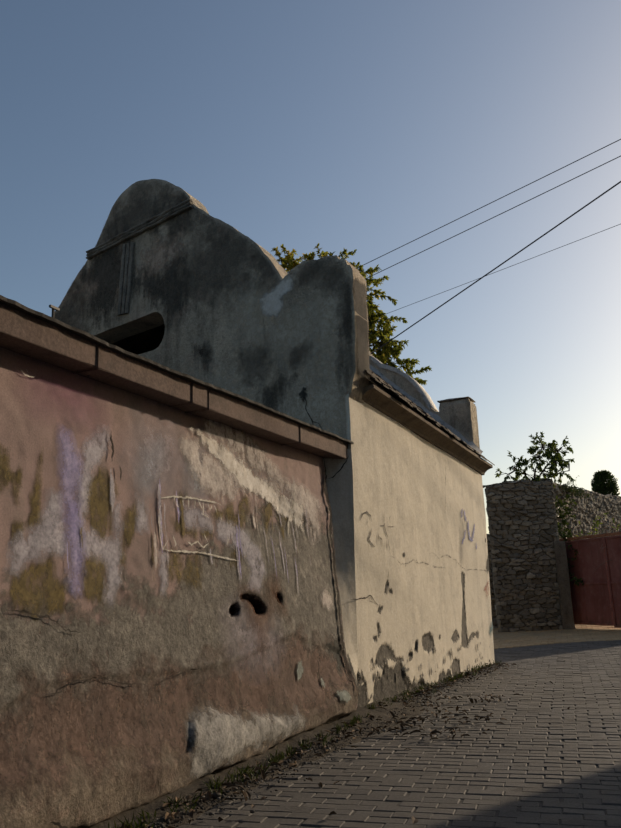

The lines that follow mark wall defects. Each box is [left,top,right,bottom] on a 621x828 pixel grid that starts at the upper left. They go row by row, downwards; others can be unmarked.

leakage [55,188,274,325]
leakage [300,261,370,378]
peeling [0,448,22,498]
peeling [12,456,43,544]
peeling [84,467,118,540]
crack [323,456,378,696]
spalling [0,495,483,828]